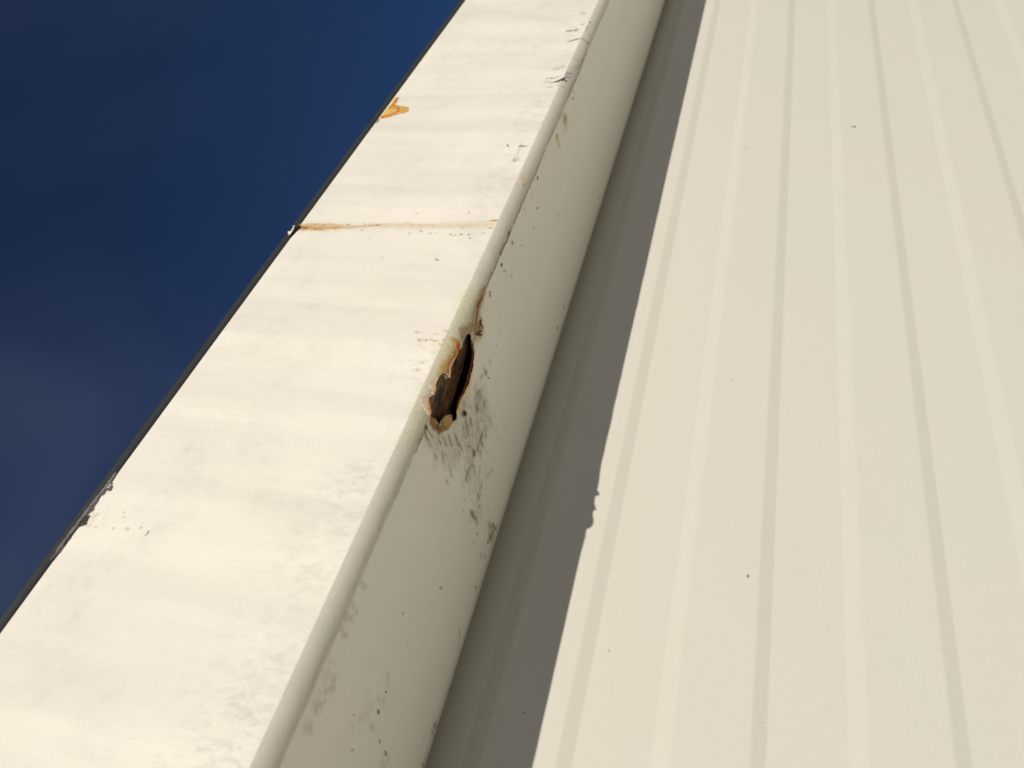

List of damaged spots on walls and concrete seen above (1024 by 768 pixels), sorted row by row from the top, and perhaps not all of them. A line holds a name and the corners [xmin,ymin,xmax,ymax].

corrosion [375,97,409,123]
corrosion [420,332,474,424]